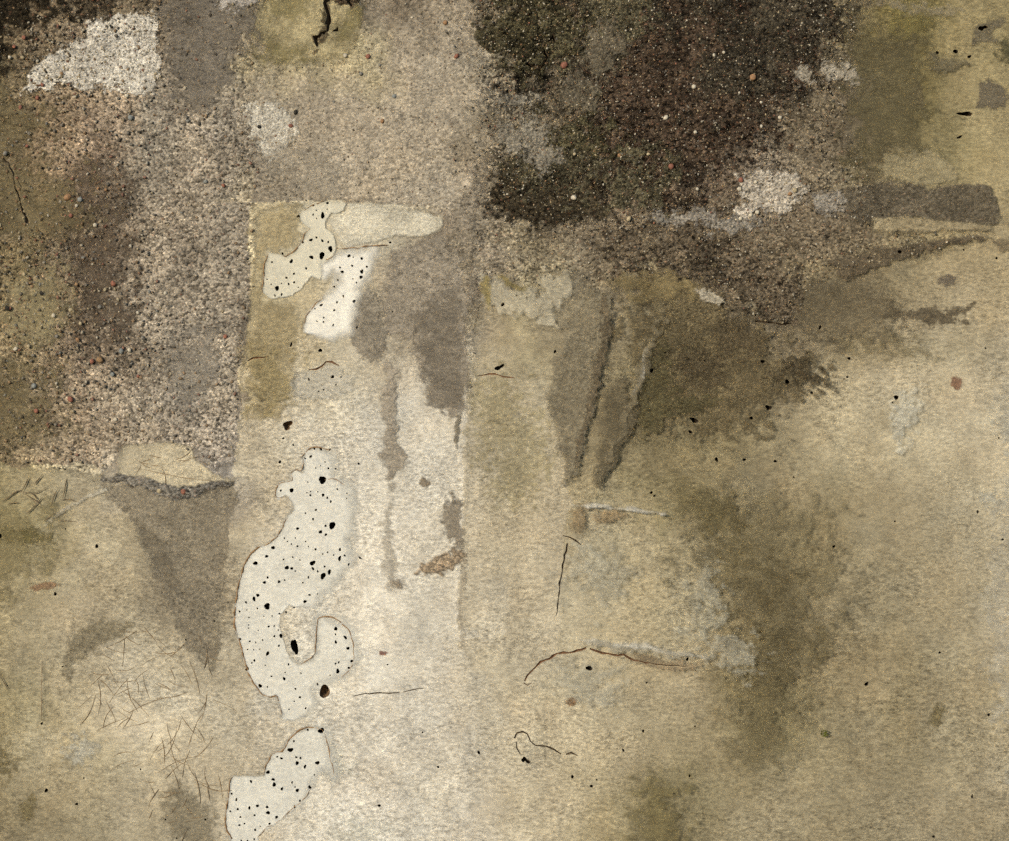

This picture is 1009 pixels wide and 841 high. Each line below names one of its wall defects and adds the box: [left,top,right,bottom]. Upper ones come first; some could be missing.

crack [311,0,359,55]
damp [351,235,474,479]
spalling [0,0,987,501]
damp [474,0,1009,488]
damp [584,503,666,515]
peeling [224,446,362,841]
crack [524,647,686,686]